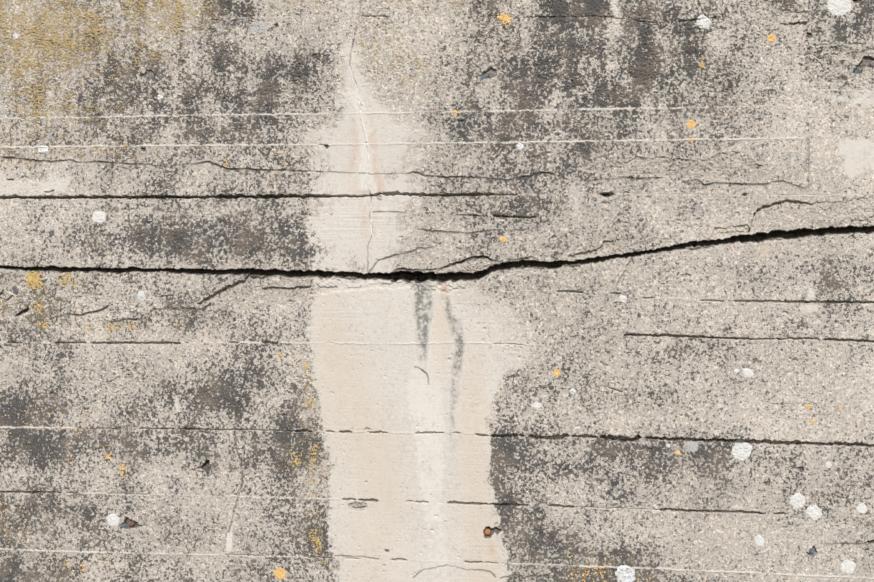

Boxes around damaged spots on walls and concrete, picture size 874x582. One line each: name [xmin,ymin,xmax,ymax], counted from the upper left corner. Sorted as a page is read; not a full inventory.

crack [349,0,362,106]
damp [608,0,623,49]
crack [699,0,713,93]
crack [0,153,874,301]
damp [288,35,543,582]
crack [227,345,255,534]